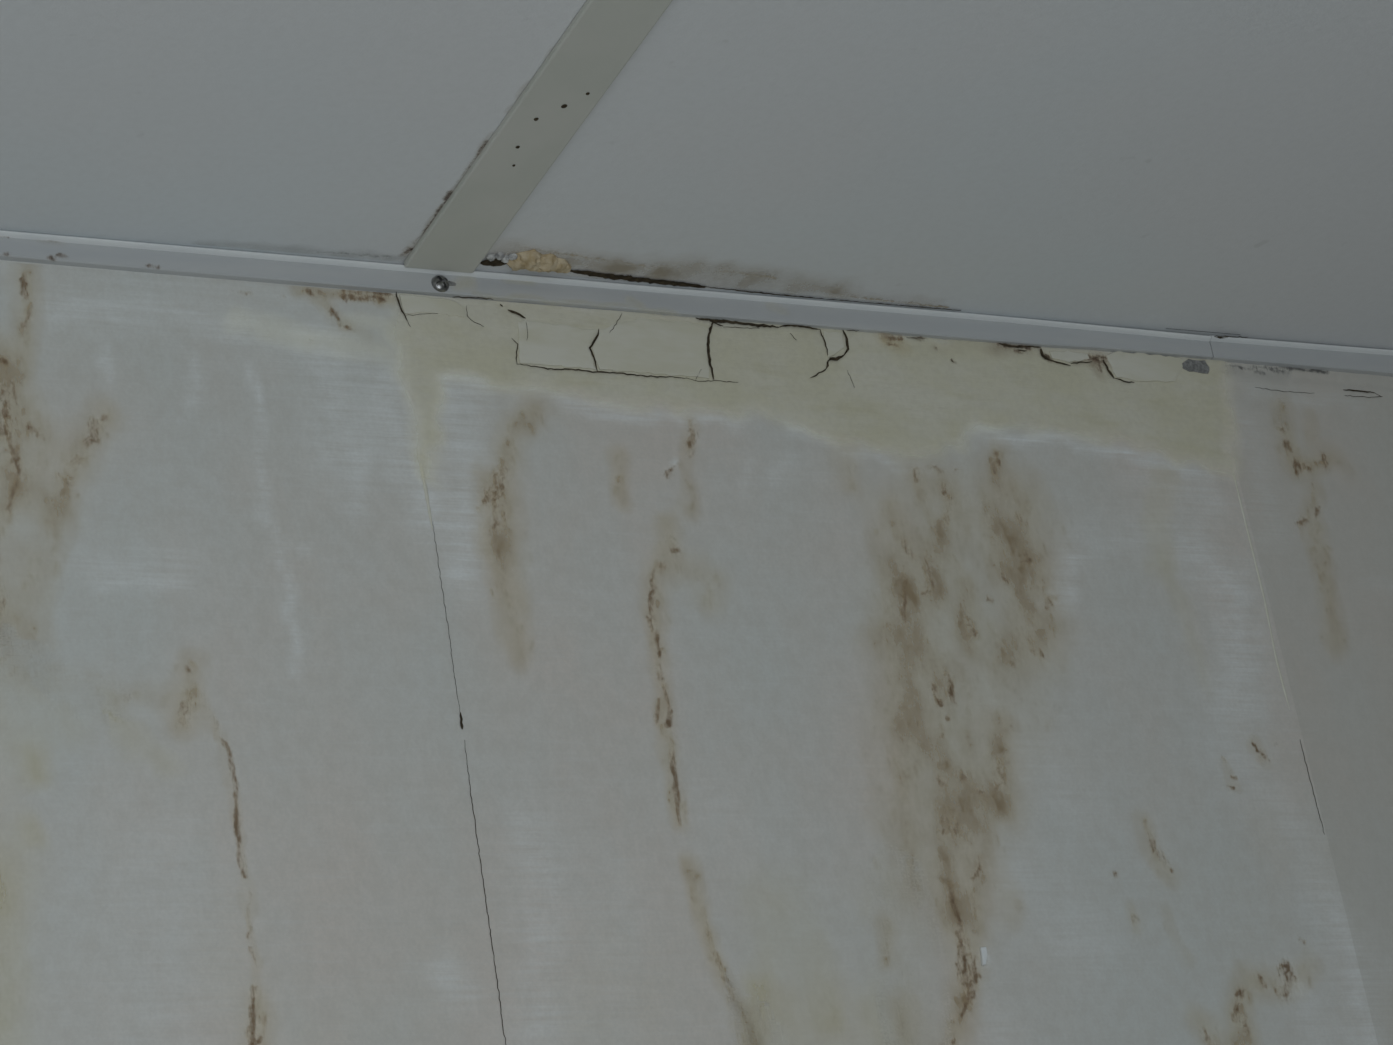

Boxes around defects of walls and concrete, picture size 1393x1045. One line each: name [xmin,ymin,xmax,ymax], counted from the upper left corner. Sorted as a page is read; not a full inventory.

crack [396,258,961,388]
crack [999,343,1134,383]
corrosion [0,356,32,509]
corrosion [994,518,1054,657]
corrosion [225,742,241,846]
corrosion [670,755,680,820]
corrosion [893,521,1010,1023]
corrosion [249,998,261,1045]